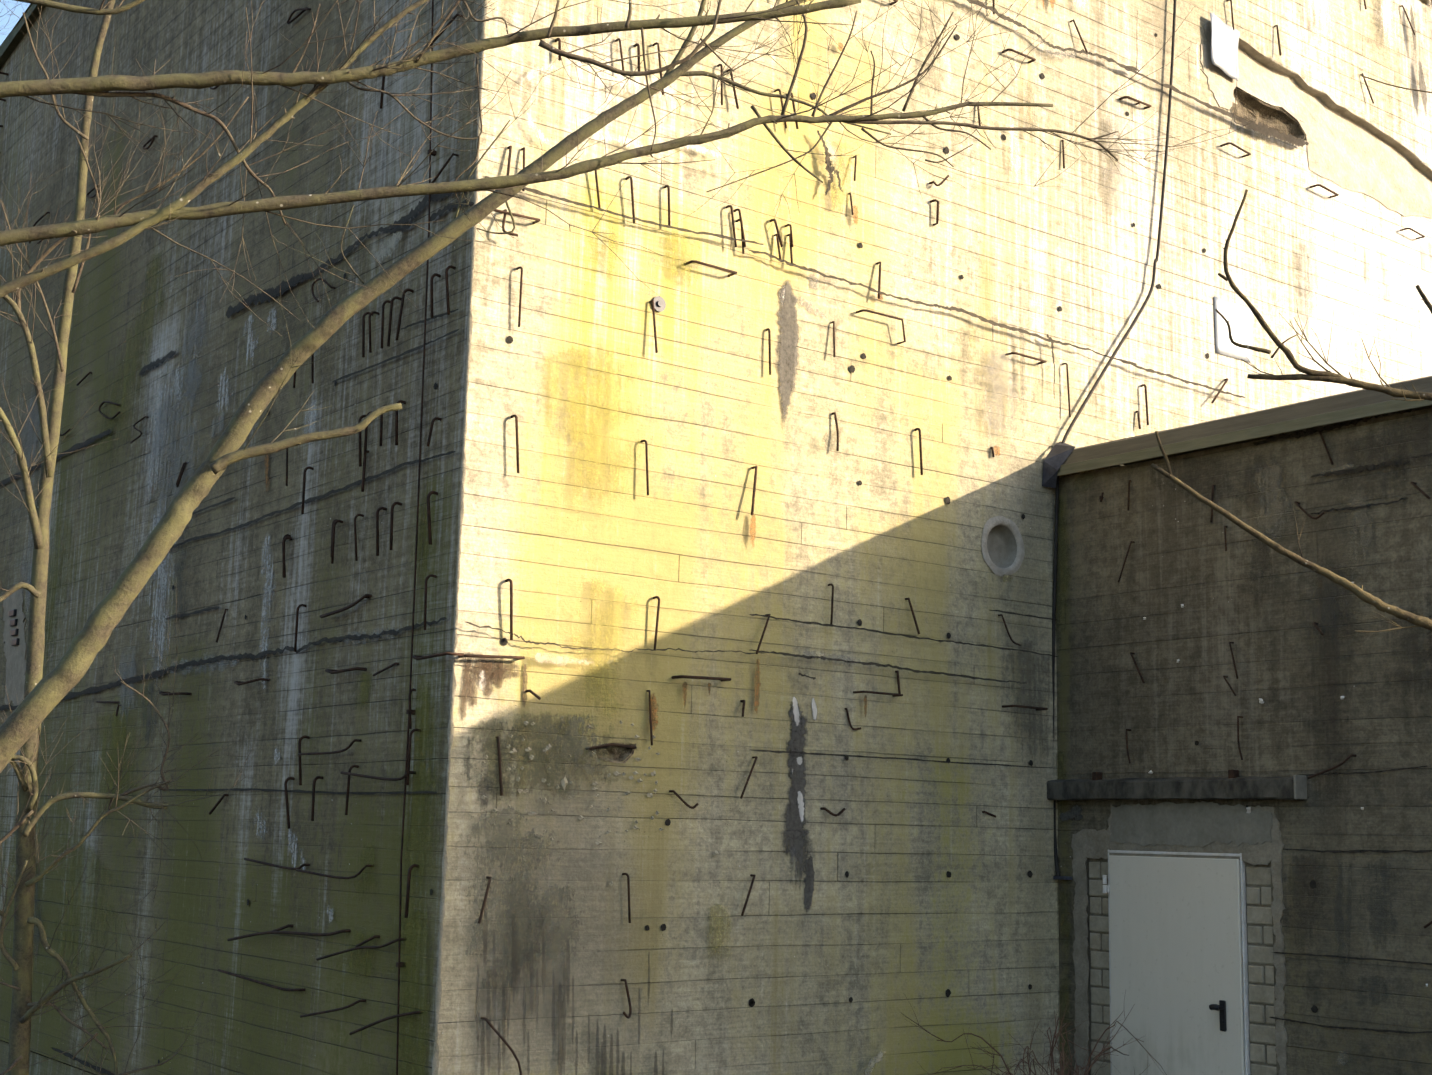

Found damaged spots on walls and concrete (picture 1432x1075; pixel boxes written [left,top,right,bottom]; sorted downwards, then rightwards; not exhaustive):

crack [817,130,843,195]
crack [967,0,1309,148]
spalling [1231,88,1306,141]
damp [777,281,799,423]
peeling [481,717,663,845]
damp [783,697,817,912]
damp [477,834,650,1075]
crack [52,1047,114,1075]